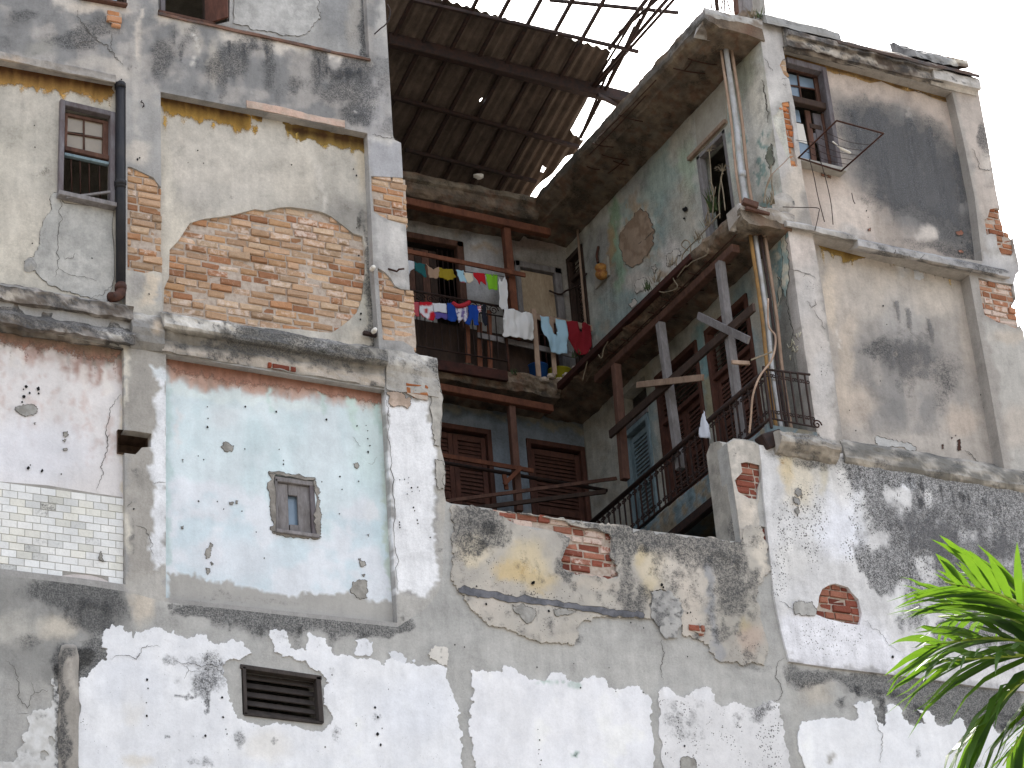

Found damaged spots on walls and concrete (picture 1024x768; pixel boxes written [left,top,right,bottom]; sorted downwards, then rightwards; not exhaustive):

crack [56,201,114,299]
flaking render [24,157,364,333]
flaking render [985,209,1012,256]
flaking render [978,279,1018,328]
crack [96,395,120,489]
flaking render [735,463,759,499]
water stain [888,478,1014,574]
flaking render [449,505,771,666]
flaking render [793,585,859,625]
mould [77,648,95,670]
peeling [78,624,968,768]
peeling [974,725,1024,768]